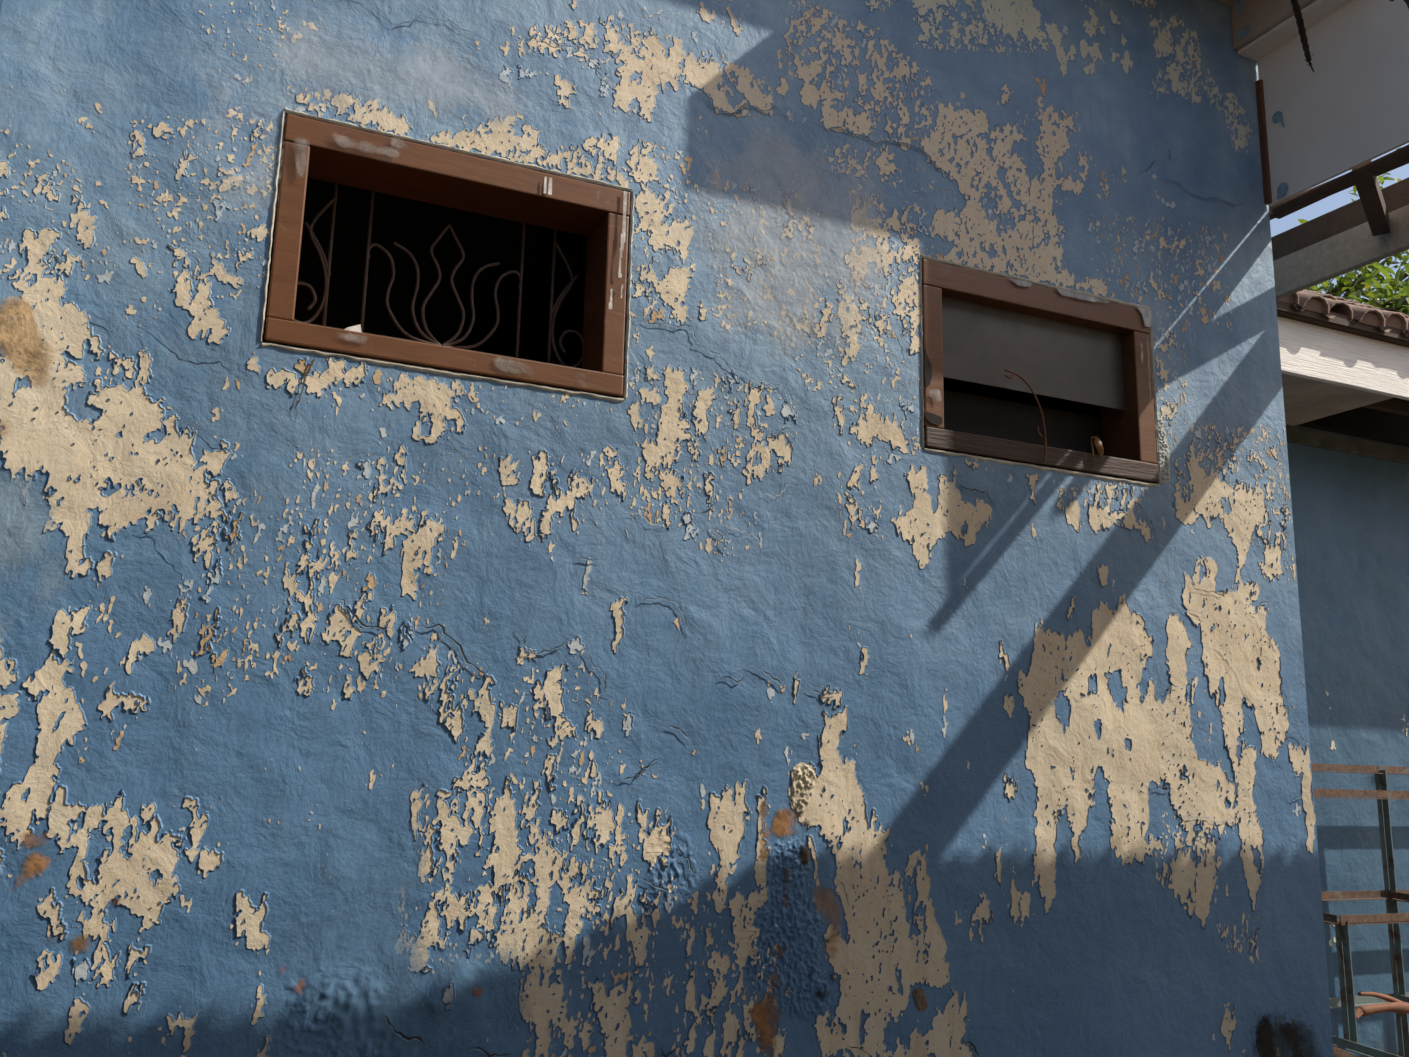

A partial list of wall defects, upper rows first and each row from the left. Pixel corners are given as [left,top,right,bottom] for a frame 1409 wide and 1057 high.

peeling [193,0,318,84]
crack [367,0,614,82]
peeling [287,88,415,157]
peeling [117,105,277,346]
water stain [0,298,47,383]
peeling [427,0,1316,964]
peeling [0,140,798,1057]
corrosion [760,801,796,859]
peeling [784,683,995,1057]
corrosion [750,976,782,1053]
peeling [1212,1002,1245,1056]
water stain [1256,1017,1316,1057]